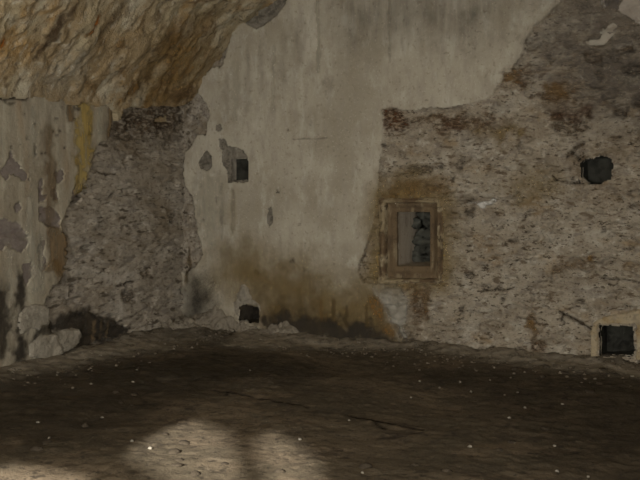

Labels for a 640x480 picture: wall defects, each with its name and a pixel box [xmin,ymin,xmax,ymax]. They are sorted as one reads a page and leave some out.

peeling [0,151,29,181]
spalling [216,124,248,183]
spalling [358,0,640,364]
peeling [0,218,28,253]
spalling [45,93,212,345]
leakage [189,280,209,315]
leakage [239,262,397,342]